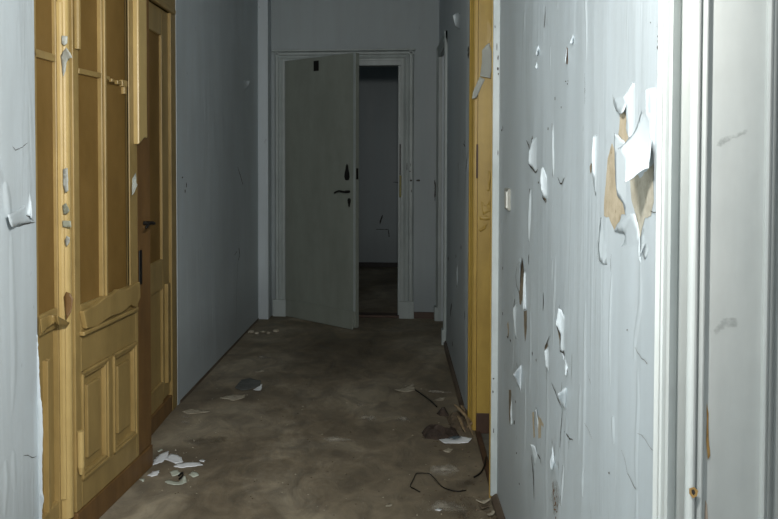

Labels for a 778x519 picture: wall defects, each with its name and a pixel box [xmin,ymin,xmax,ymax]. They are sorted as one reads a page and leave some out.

peeling [472,43,499,99]
peeling [8,194,34,227]
peeling [526,137,547,203]
peeling [590,82,656,271]
peeling [502,260,527,342]
peeling [509,365,521,425]
peeling [545,338,566,410]
peeling [556,305,568,375]